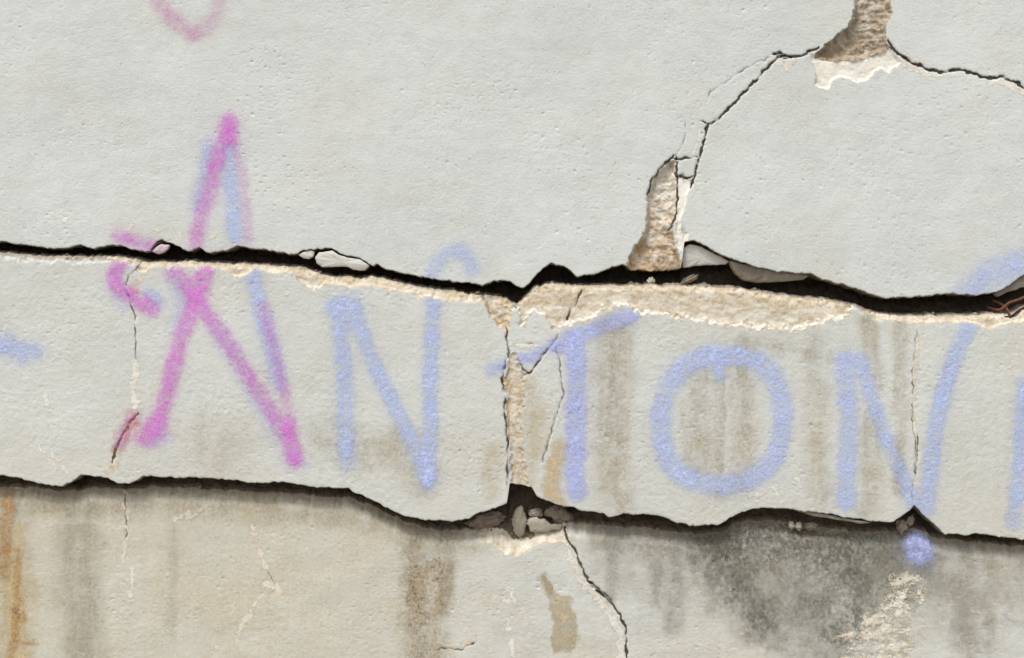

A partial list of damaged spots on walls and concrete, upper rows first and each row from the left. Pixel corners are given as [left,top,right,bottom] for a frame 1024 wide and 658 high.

flaking render [811,0,902,90]
crack [887,40,1024,96]
crack [647,47,819,231]
flaking render [107,158,1024,333]
crack [0,240,1024,658]
flaking render [503,352,530,485]
corrosion [0,487,30,658]
flaking render [470,523,568,558]
damp [542,576,577,653]
damp [688,521,926,645]